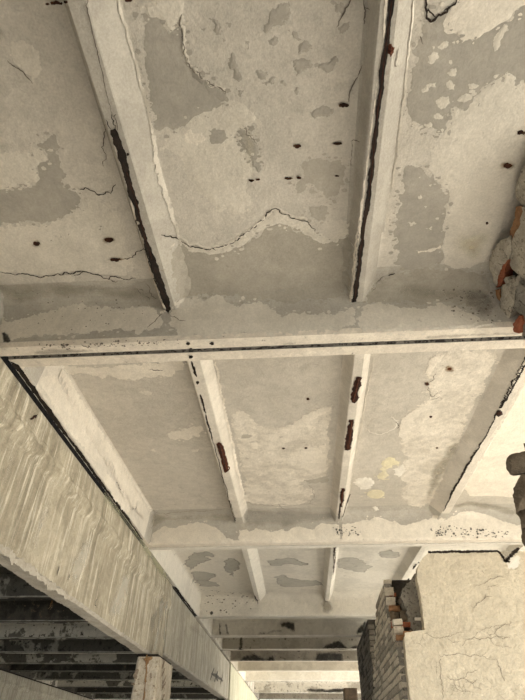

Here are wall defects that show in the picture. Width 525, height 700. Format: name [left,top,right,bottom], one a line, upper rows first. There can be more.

crack [336,0,369,28]
peeling [0,132,84,227]
peeling [106,0,525,336]
crack [163,207,316,250]
crack [2,271,185,326]
peeling [299,447,329,474]
crack [443,357,525,511]